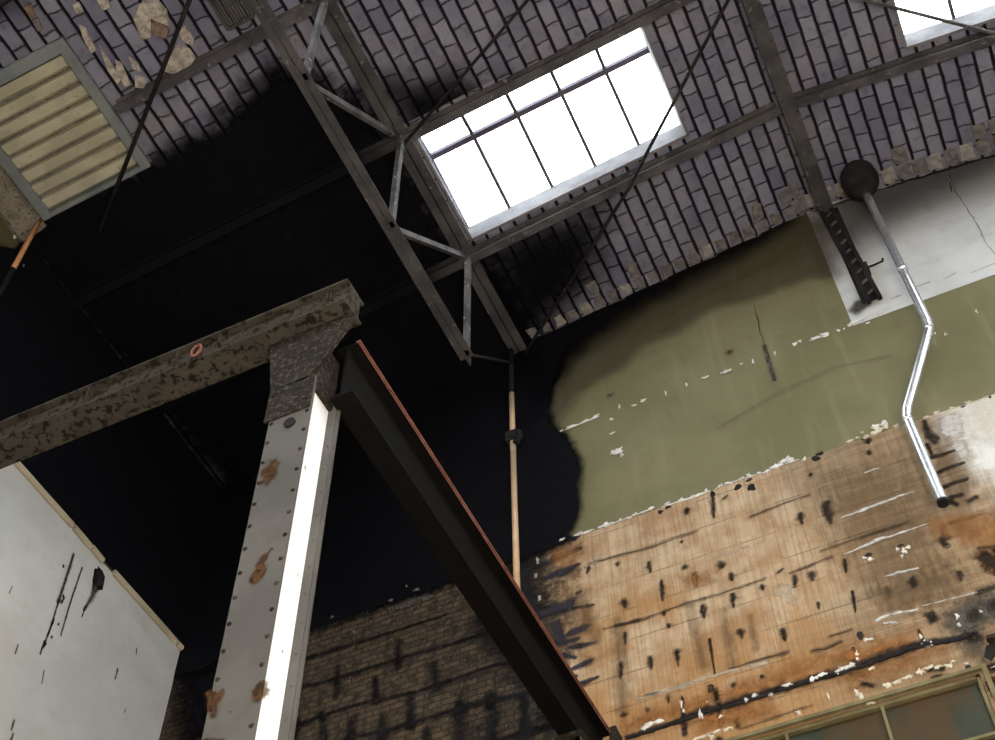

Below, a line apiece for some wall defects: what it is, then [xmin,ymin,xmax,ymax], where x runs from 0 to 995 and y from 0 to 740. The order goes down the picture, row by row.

spalling [73,2,148,88]
spalling [133,0,196,80]
crack [877,154,995,253]
peeling [846,420,899,443]
corrosion [260,460,278,484]
peeling [560,451,824,541]
corrosion [250,550,270,583]
damp [884,567,919,599]
damp [875,592,977,624]
corrosion [205,689,224,718]
corrosion [252,680,270,702]
spalling [624,613,974,740]